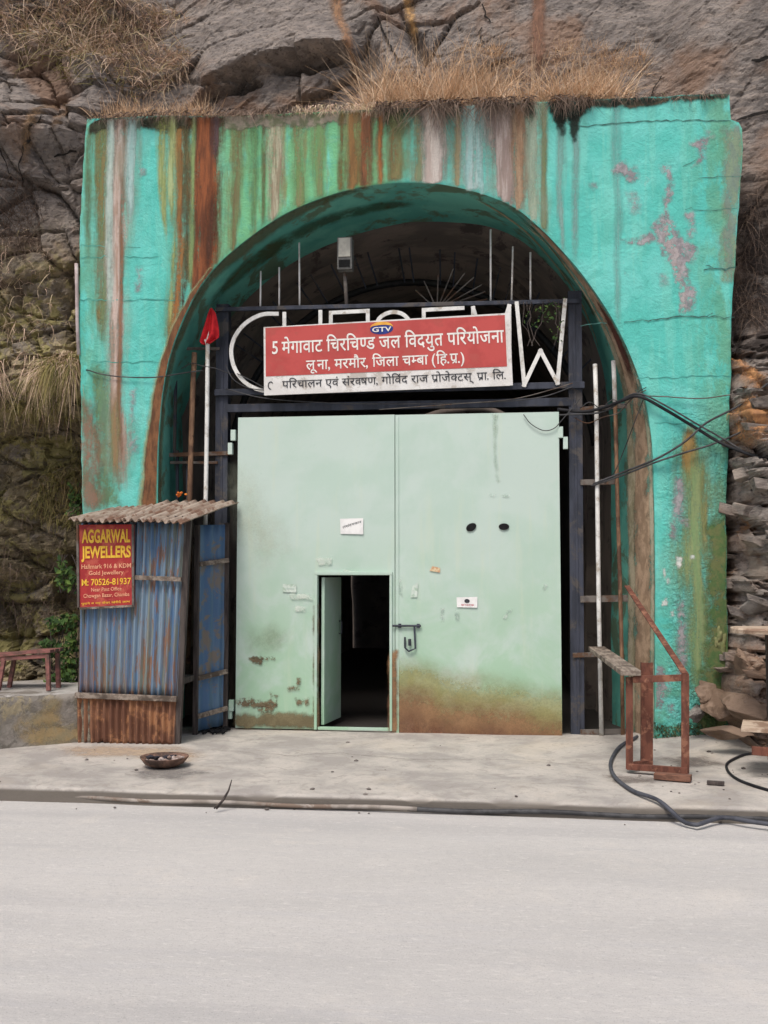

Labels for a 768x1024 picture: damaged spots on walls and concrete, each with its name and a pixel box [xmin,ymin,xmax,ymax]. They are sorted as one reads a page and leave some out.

crack [582,76,768,127]
crack [751,55,768,63]
corrosion [86,127,117,335]
water stain [384,102,579,291]
peeling [613,162,638,182]
peeling [628,166,696,312]
corrosion [139,111,404,506]
corrosion [81,400,100,509]
corrosion [528,222,655,734]
corrosion [235,650,319,729]
corrosion [388,650,562,736]